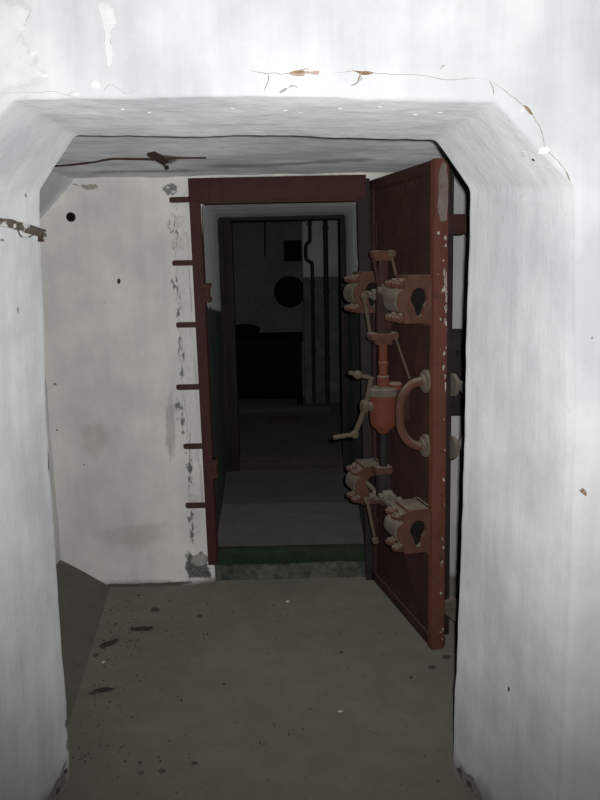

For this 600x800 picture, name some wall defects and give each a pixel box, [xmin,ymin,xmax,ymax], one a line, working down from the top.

crack [334,71,572,186]
peeling [163,183,177,195]
peeling [168,216,202,541]